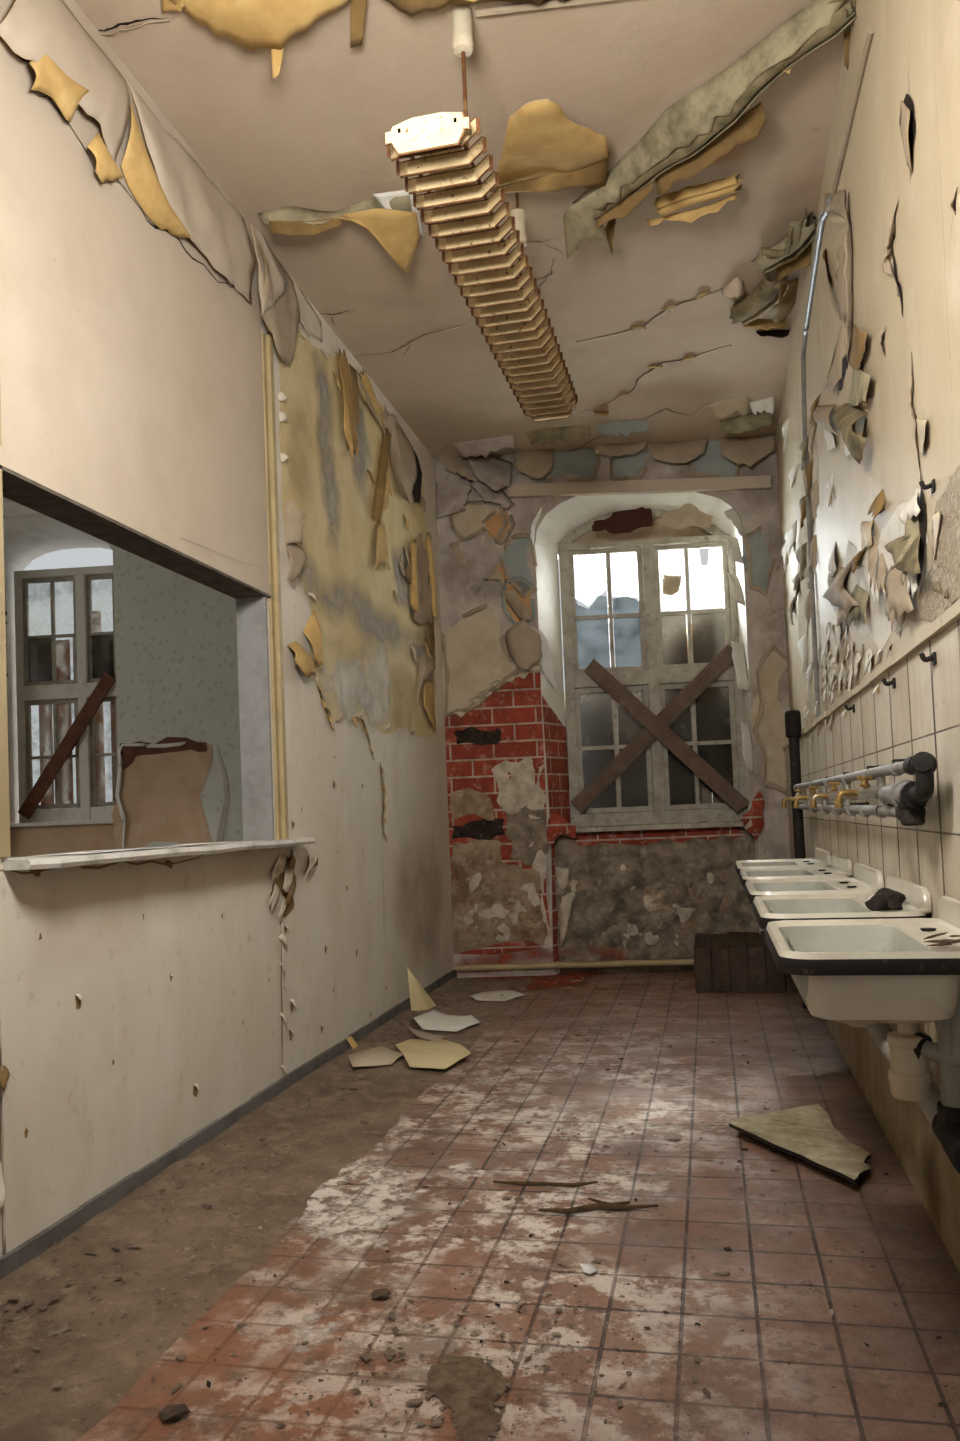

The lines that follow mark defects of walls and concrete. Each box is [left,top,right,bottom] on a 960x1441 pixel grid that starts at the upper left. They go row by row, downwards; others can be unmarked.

crack [576,279,743,343]
crack [574,344,732,451]
flaking render [0,0,960,973]